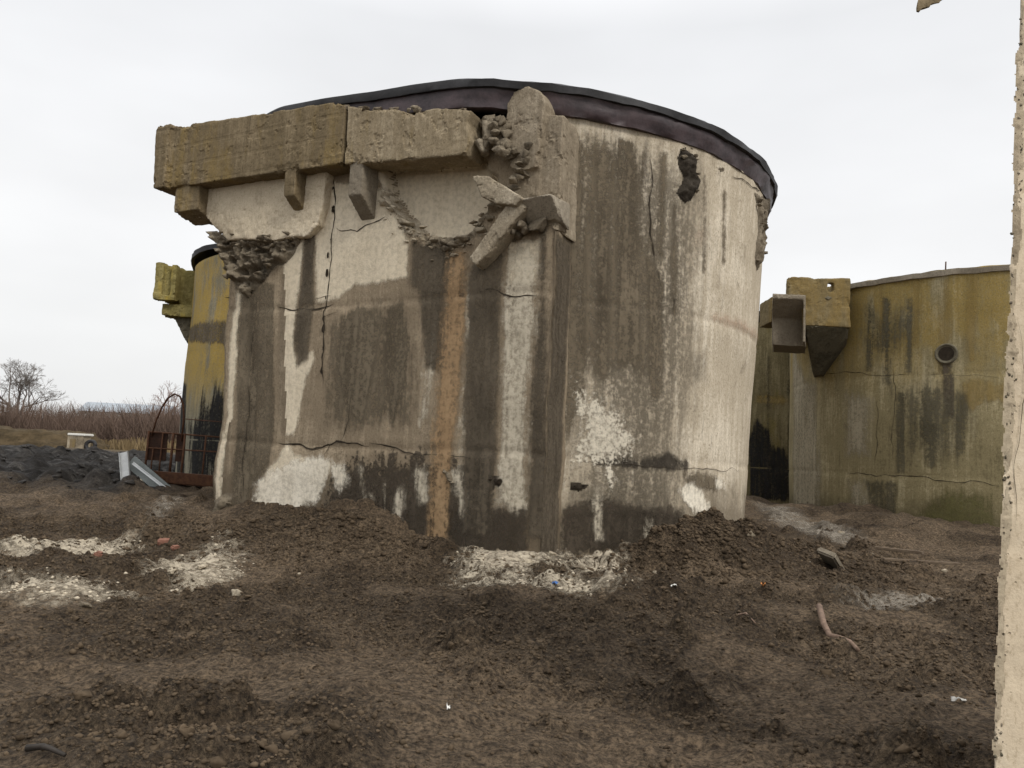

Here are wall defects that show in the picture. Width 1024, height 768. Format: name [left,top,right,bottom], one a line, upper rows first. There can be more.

water stain [189,283,346,507]
water stain [294,236,314,365]
crack [280,179,391,376]
peeling [206,114,533,513]
crack [279,393,467,458]
water stain [411,242,452,370]
corrosion [427,252,467,538]
water stain [450,254,503,536]
water stain [529,136,725,555]
spalling [676,147,701,203]
spalling [754,193,771,270]
water stain [767,447,789,502]